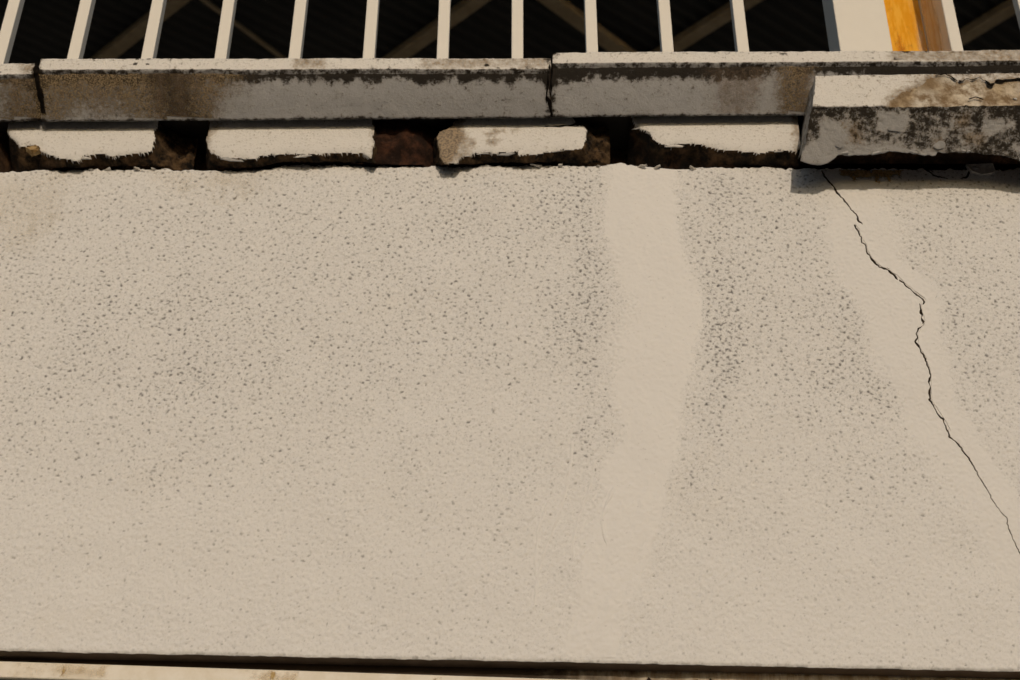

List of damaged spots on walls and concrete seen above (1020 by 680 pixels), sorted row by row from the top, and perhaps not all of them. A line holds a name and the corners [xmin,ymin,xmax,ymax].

water stain [0,73,241,120]
spalling [889,74,1020,107]
spalling [8,121,383,172]
spalling [433,121,610,168]
spalling [626,117,808,171]
spalling [827,141,1020,176]
crack [821,171,1020,553]